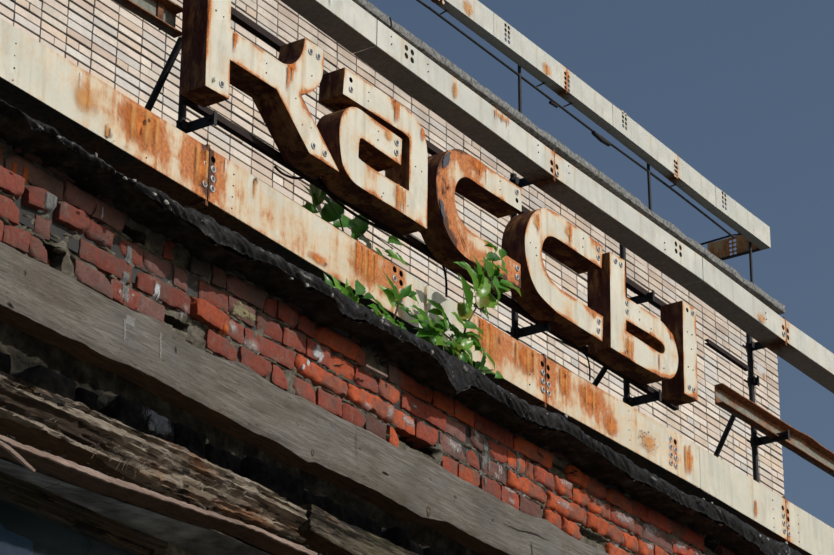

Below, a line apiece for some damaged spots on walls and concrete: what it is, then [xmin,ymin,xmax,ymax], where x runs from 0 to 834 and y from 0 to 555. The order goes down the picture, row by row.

rust [77,89,97,108]
rust [127,103,159,145]
rust [196,146,209,183]
rust [560,368,570,392]
rust [604,414,617,434]